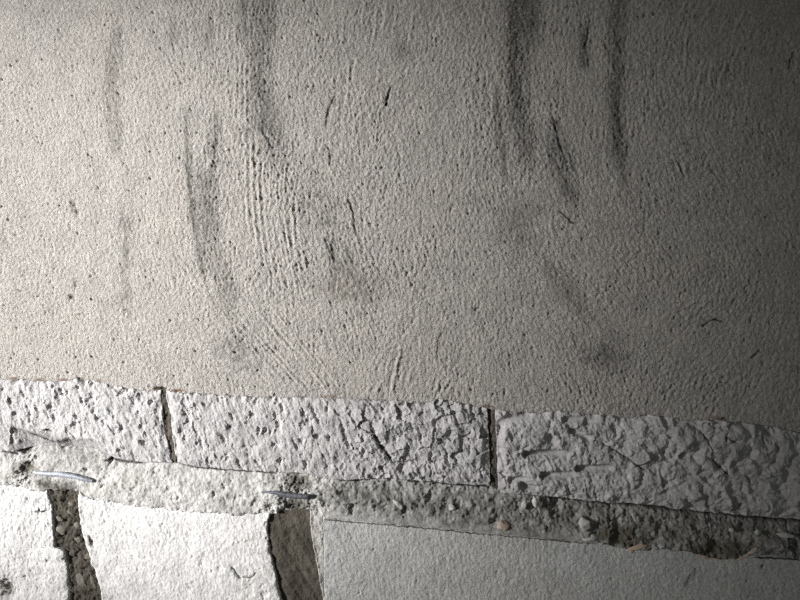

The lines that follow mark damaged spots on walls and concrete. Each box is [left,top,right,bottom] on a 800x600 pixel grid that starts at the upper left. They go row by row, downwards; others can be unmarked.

spalling [289,475,306,489]
spalling [578,517,648,553]